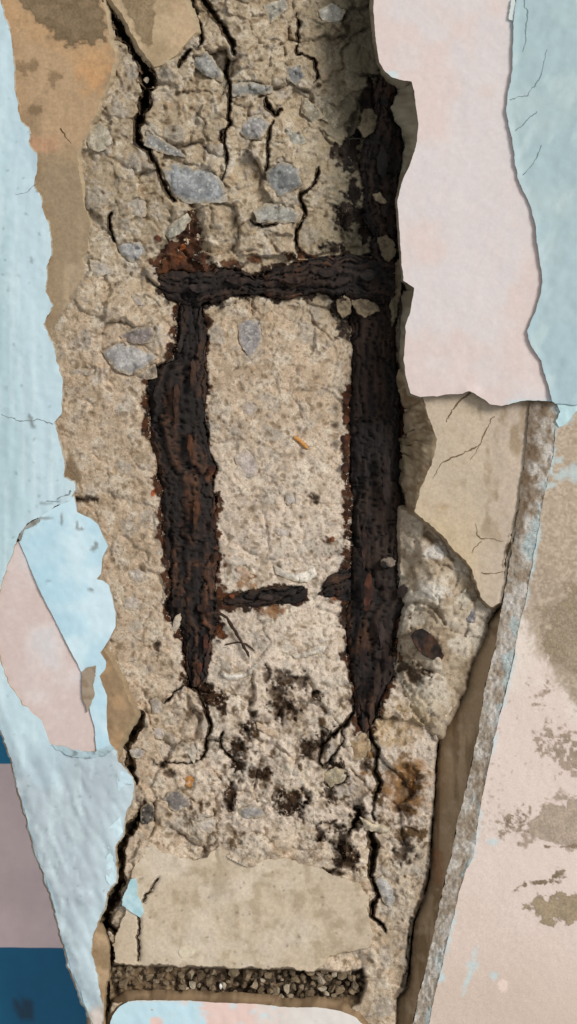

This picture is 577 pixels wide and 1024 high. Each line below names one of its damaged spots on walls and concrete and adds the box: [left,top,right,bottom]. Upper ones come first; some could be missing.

crack [103,0,236,202]
crack [264,97,281,171]
crack [250,167,320,252]
spalling [0,0,439,1024]
rust [140,70,381,716]
rust [383,402,405,507]
peeling [369,0,577,1024]
crack [101,813,159,1021]
crack [123,684,238,784]
rust [329,597,411,759]
crack [319,706,442,996]
rust [381,752,426,814]